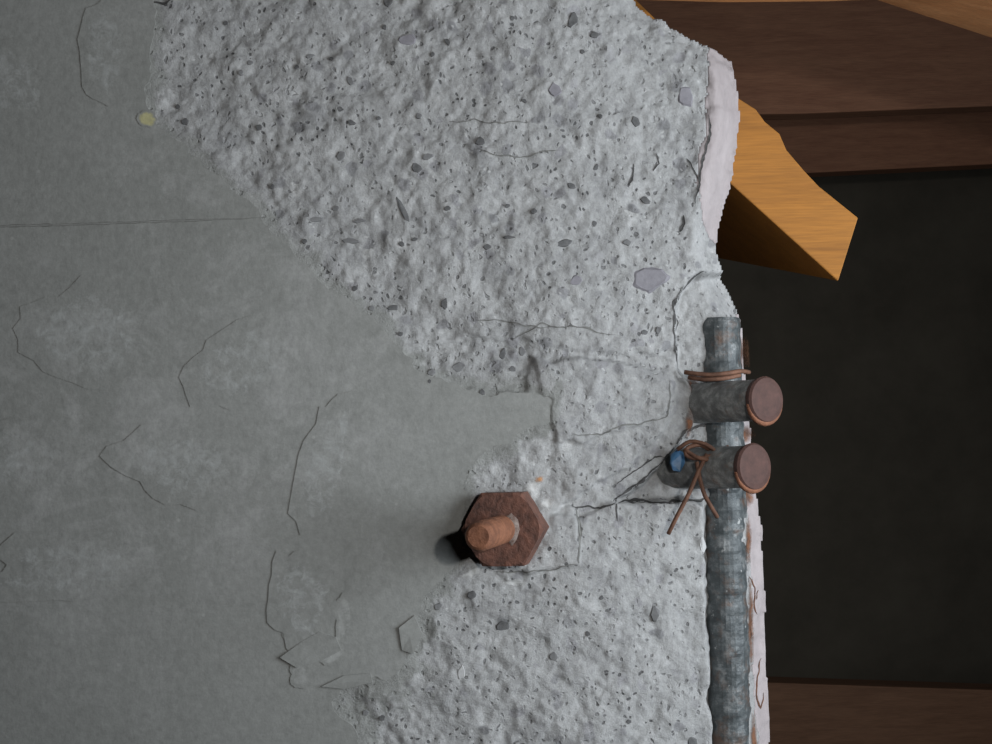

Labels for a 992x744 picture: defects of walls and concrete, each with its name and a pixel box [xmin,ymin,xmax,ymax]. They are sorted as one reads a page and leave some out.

crack [450,117,523,125]
crack [477,148,556,158]
spalling [144,0,783,744]
crack [477,271,710,573]